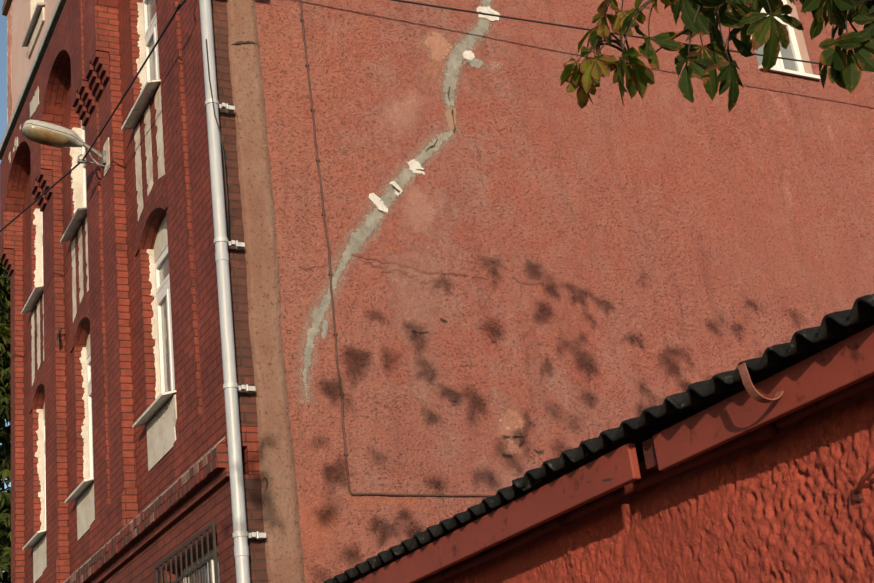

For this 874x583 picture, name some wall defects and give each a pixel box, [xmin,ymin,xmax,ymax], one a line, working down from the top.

crack [297,0,494,403]